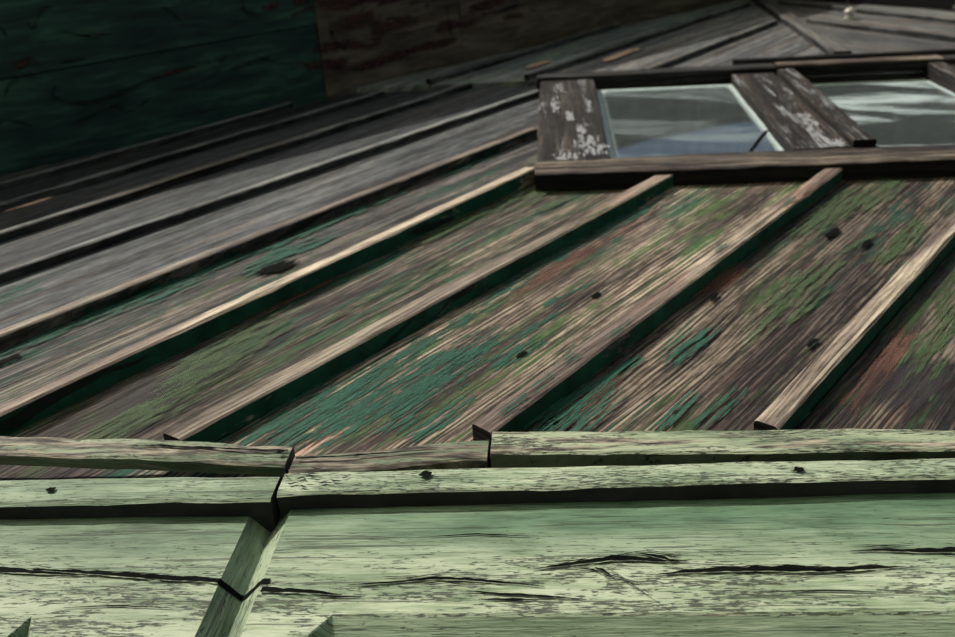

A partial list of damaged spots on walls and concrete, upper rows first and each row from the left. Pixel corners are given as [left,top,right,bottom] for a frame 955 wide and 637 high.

peeling [552,83,609,160]
peeling [80,254,452,440]
peeling [212,184,673,456]
crack [0,543,955,610]